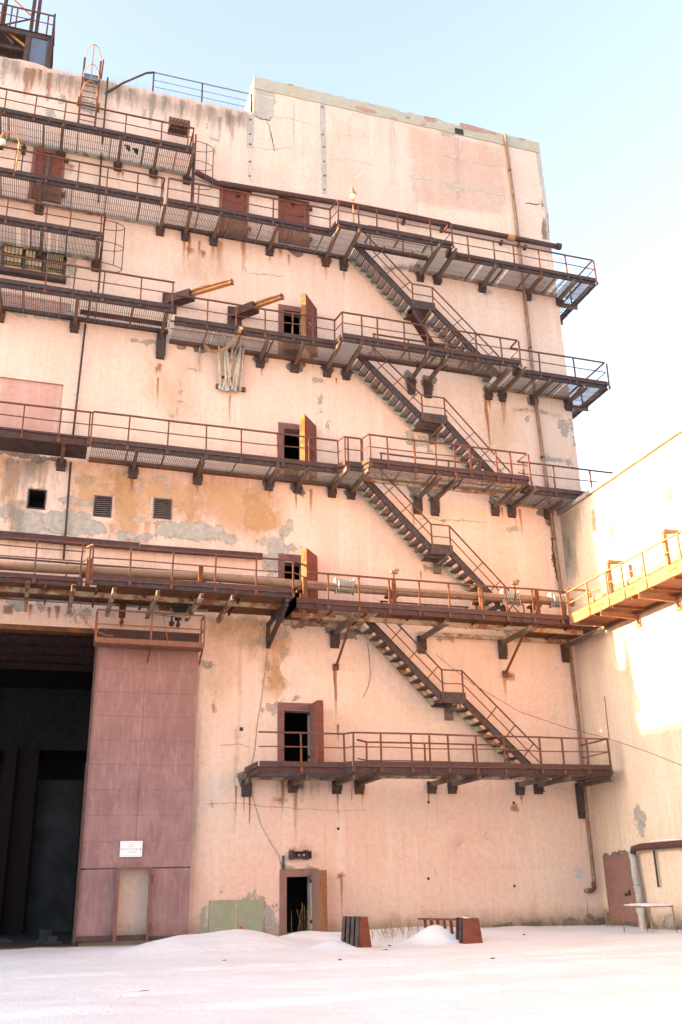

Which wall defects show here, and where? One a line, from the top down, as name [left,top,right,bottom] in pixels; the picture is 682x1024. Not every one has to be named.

damp [4,59,53,92]
crack [253,114,301,150]
flaking render [558,400,577,446]
spalling [0,450,60,464]
flaking render [0,475,237,545]
flaking render [323,627,362,640]
flaking render [237,614,304,714]
flaking render [633,803,646,837]